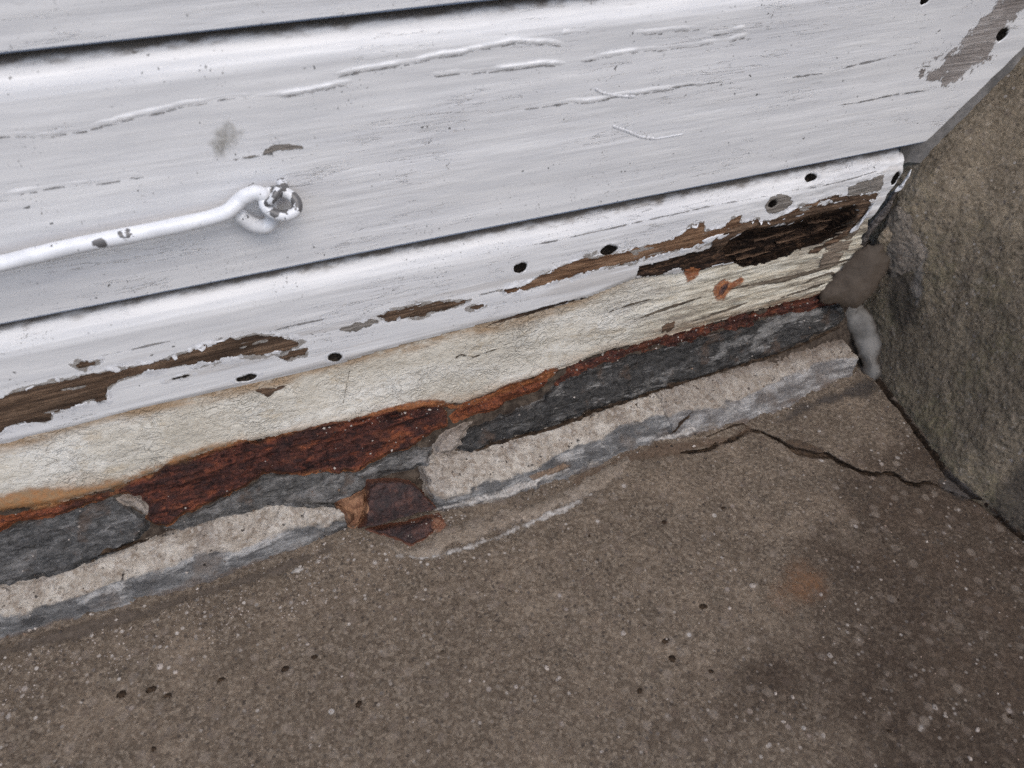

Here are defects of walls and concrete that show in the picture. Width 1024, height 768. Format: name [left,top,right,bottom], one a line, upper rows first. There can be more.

peeling [918,0,1024,88]
spalling [235,144,303,160]
spalling [497,170,911,298]
peeling [340,298,487,332]
rust [713,278,744,300]
peeling [0,331,308,436]
rust [0,293,836,532]
crack [669,361,1024,541]